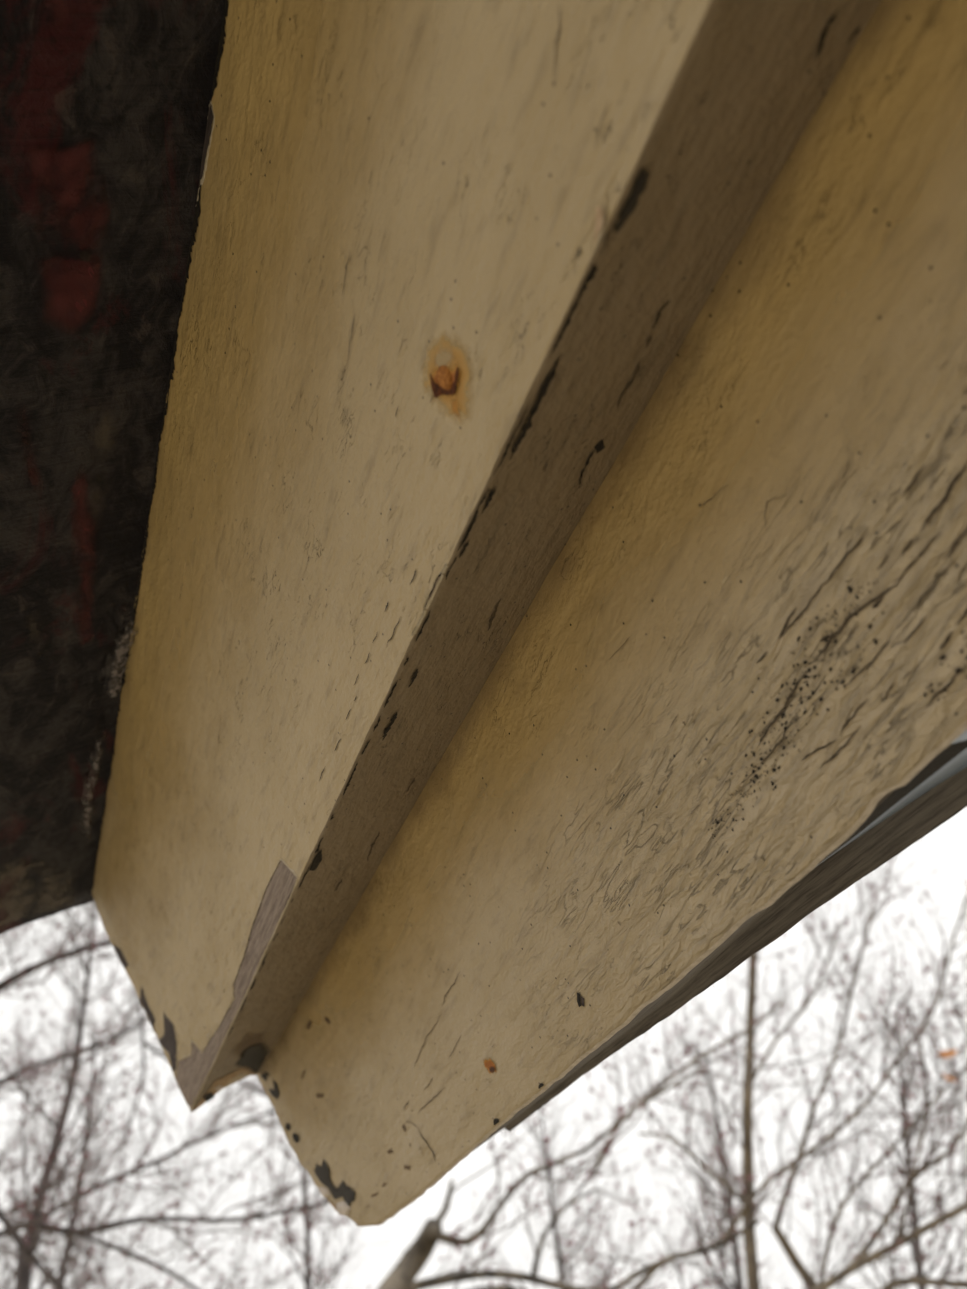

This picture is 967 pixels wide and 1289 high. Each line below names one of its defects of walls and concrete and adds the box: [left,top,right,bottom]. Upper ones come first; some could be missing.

rust [424,336,470,416]
spalling [412,168,650,641]
damp [298,0,967,1030]
spalling [343,658,418,795]
peeling [139,838,323,1111]
spalling [314,1160,355,1216]